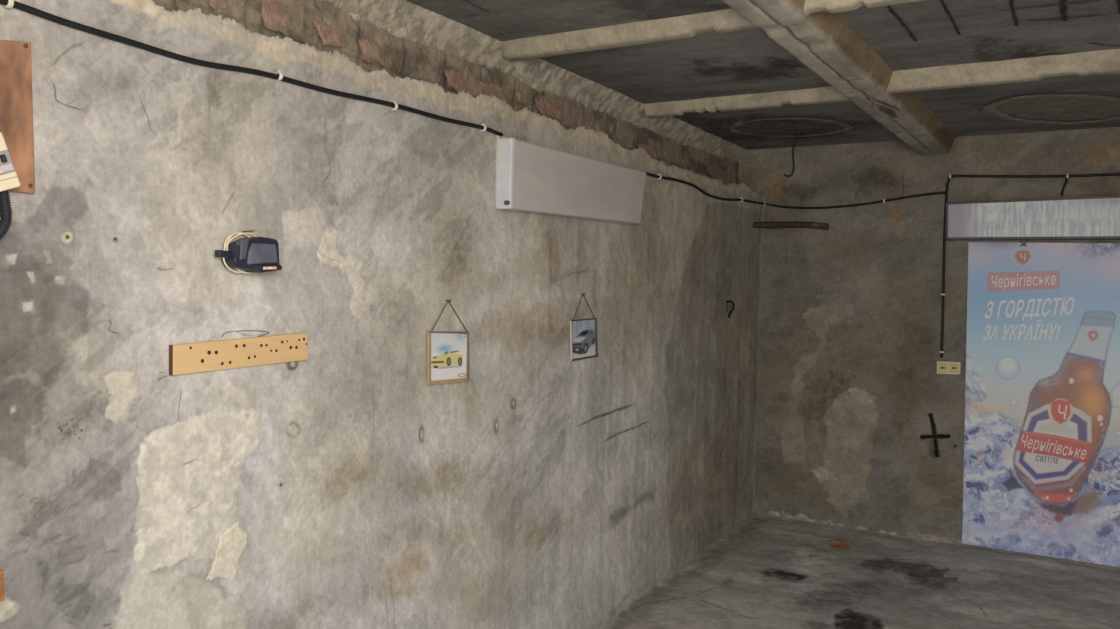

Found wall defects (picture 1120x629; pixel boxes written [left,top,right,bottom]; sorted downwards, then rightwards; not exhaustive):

spalling [106,0,758,200]
water stain [585,201,964,629]
flaking render [205,521,248,582]